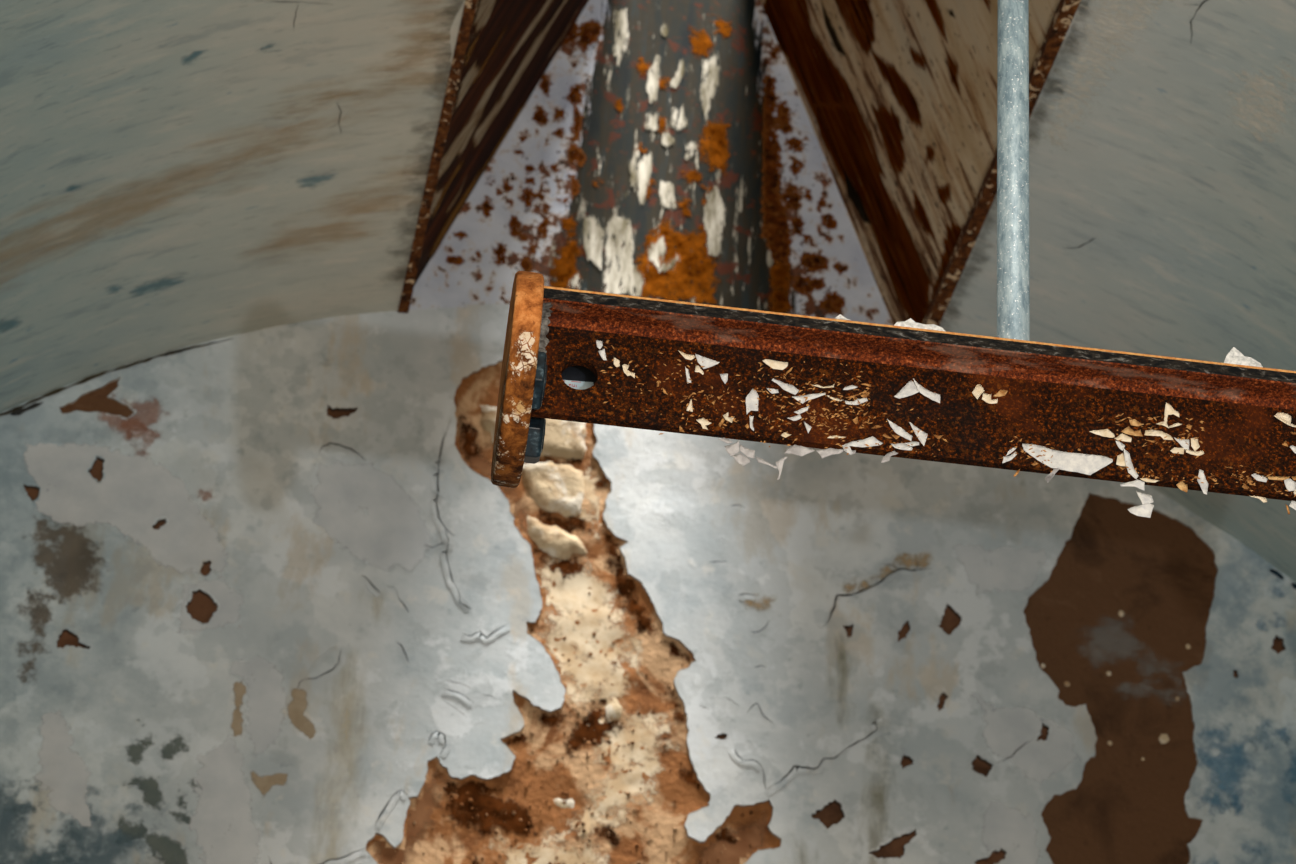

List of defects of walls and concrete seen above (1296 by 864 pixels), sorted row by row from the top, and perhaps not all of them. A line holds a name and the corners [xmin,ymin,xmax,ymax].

crack [1188,0,1208,44]
rust [446,73,604,290]
peeling [583,215,678,297]
peeling [629,55,697,208]
rust [633,120,731,304]
rust [759,0,964,325]
peeling [678,350,928,480]
flaking render [366,360,781,864]
crack [321,789,408,864]
crack [428,680,495,758]
damp [982,801,1043,864]
damp [1199,730,1249,808]